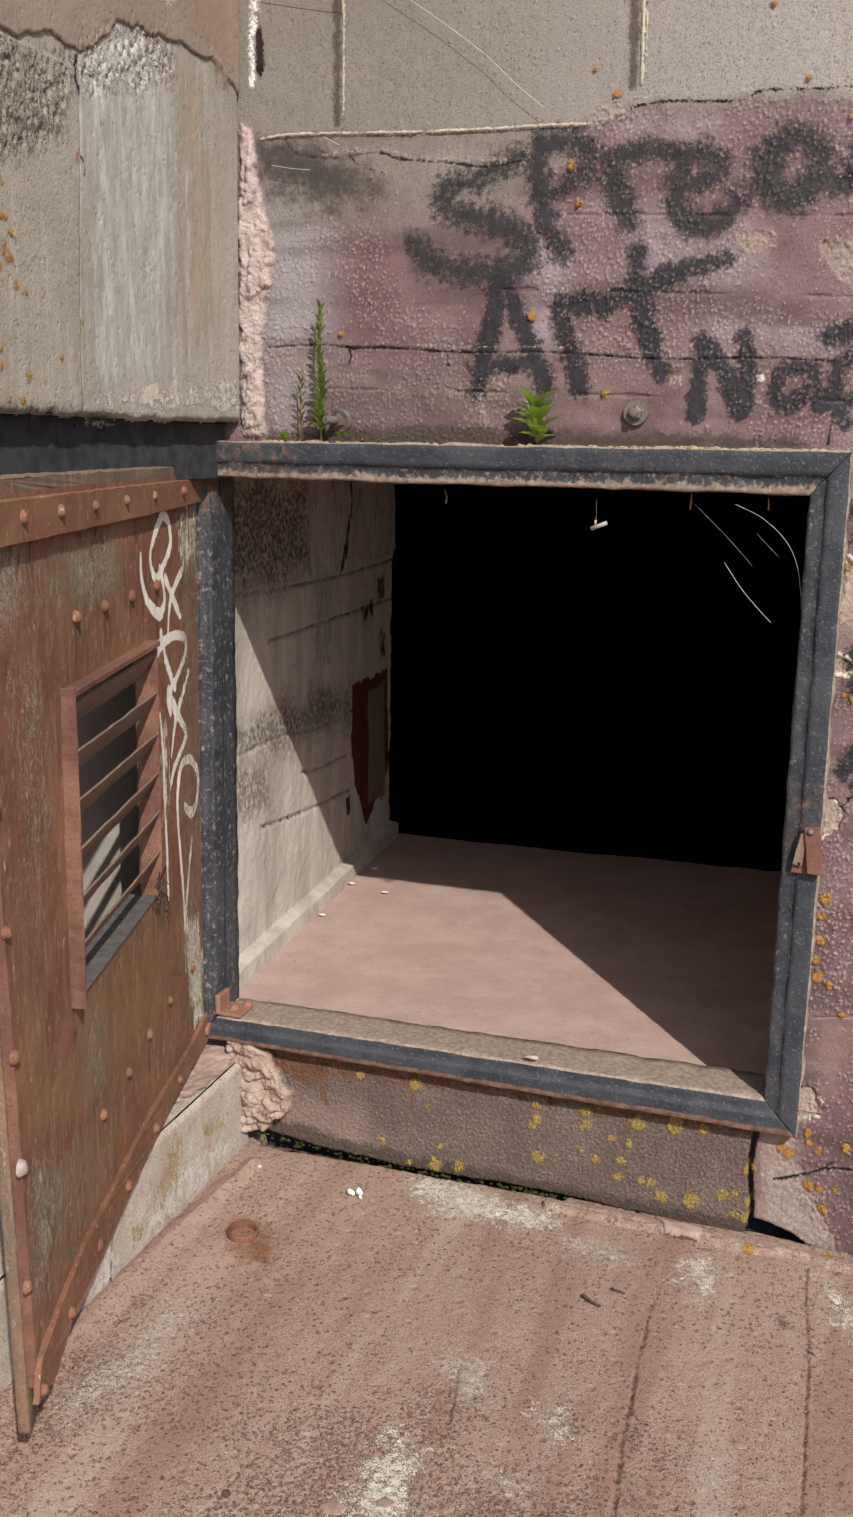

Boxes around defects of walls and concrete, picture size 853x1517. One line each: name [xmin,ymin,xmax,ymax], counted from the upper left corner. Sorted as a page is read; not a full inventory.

peeling [0,0,266,166]
water stain [78,28,193,410]
crack [268,343,837,445]
peeling [346,572,389,824]
crack [773,1160,852,1181]
crack [614,1299,654,1510]
crack [800,1281,826,1516]